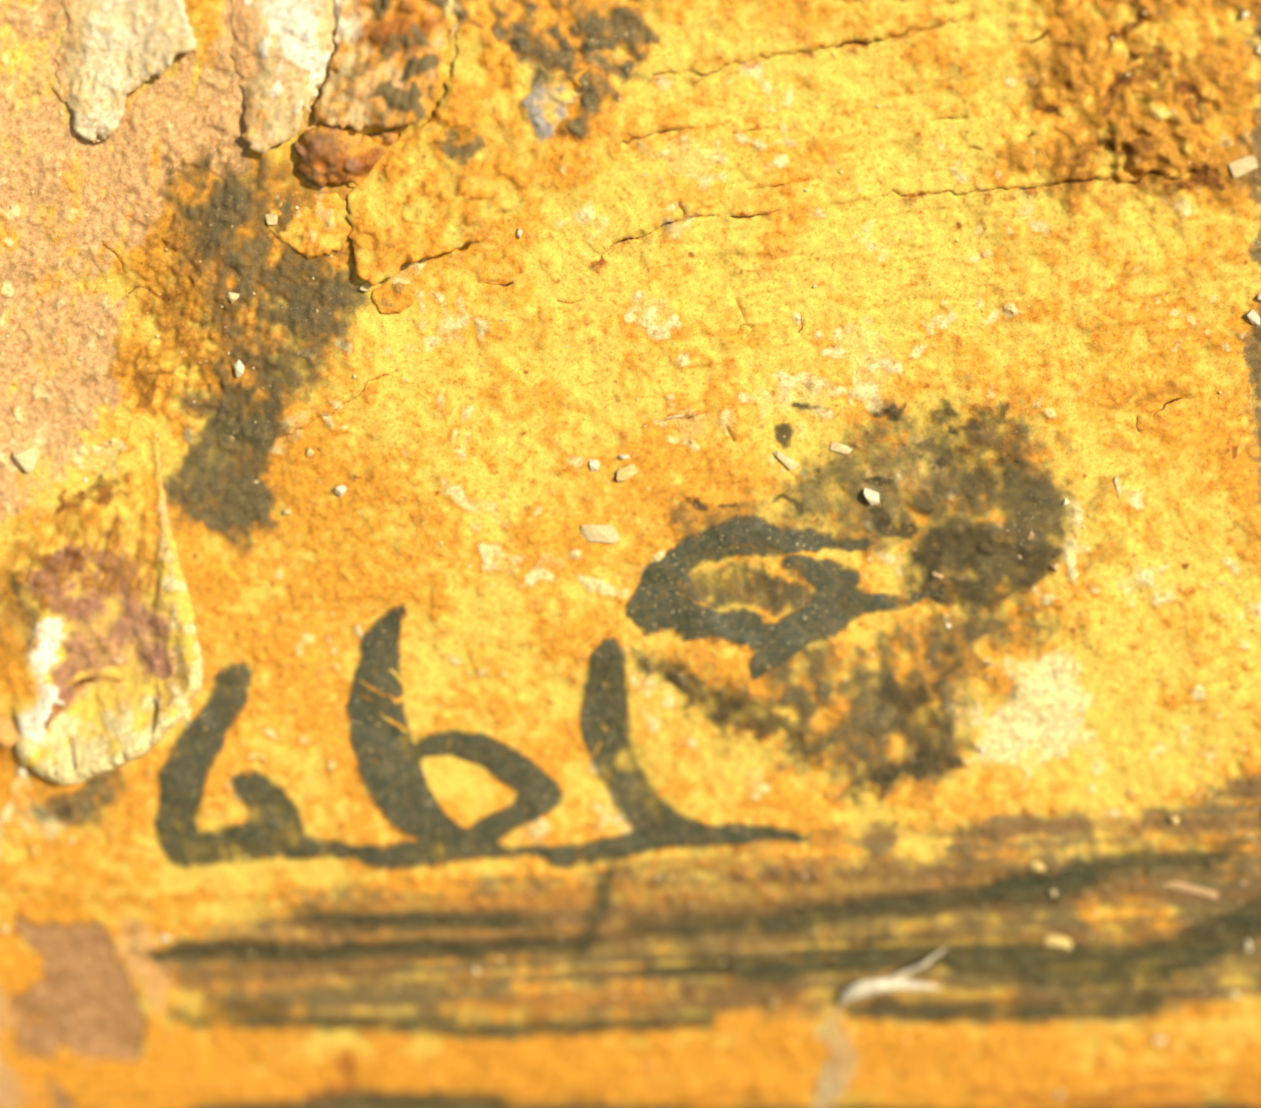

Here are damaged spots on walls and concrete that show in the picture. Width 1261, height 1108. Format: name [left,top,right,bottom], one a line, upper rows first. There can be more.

peeling [52,0,197,142]
crack [652,0,970,86]
peeling [230,0,593,314]
crack [616,127,694,145]
crack [589,177,819,270]
crack [882,171,1202,197]
leakage [168,158,358,543]
peeling [0,415,204,786]
leakage [640,403,1065,800]
leakage [151,869,612,963]
leakage [632,839,1261,937]
leakage [171,1003,715,1041]